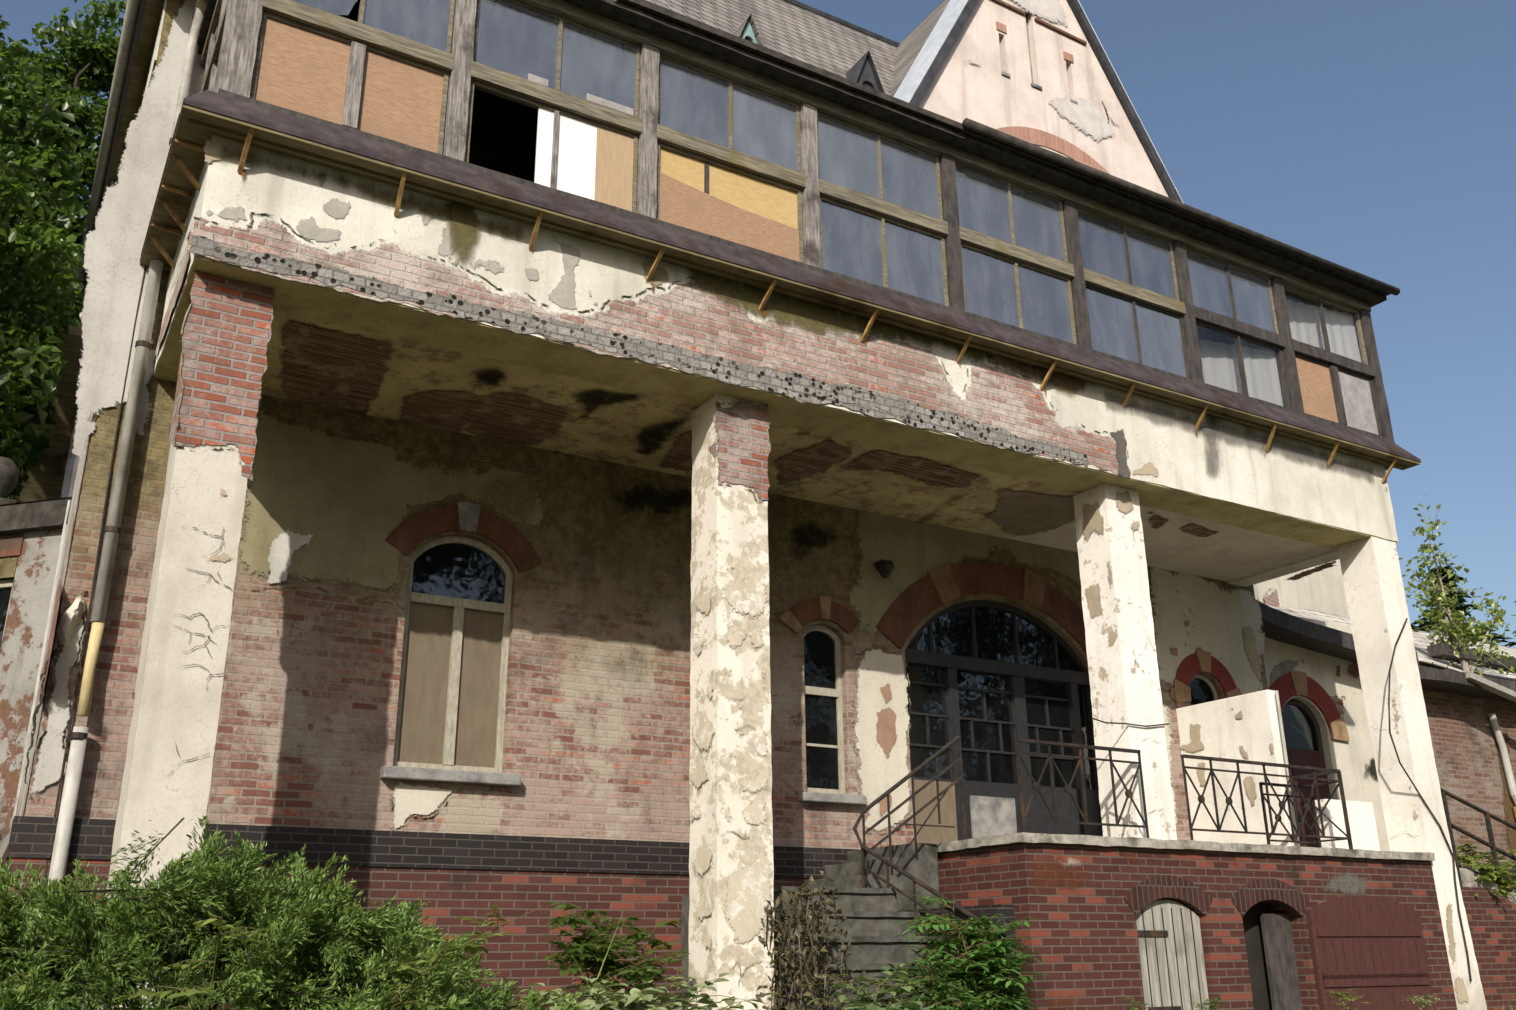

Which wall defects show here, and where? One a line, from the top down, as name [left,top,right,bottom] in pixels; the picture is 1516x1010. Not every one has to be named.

flaking render [72,0,1219,834]
leakage [637,417,688,455]
leakage [614,485,692,515]
crack [173,526,251,690]
peeling [691,845,712,876]
peeling [696,851,773,956]